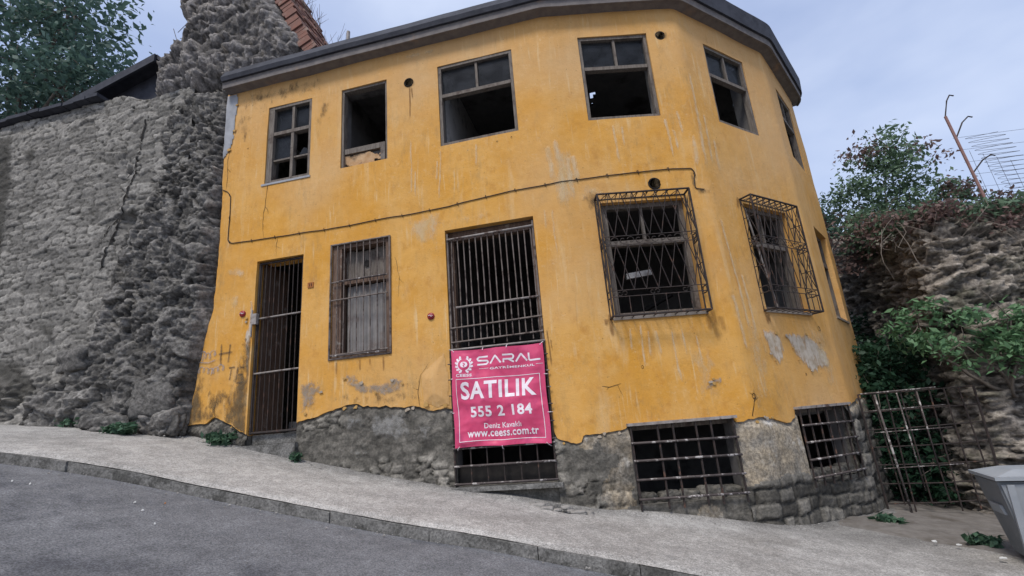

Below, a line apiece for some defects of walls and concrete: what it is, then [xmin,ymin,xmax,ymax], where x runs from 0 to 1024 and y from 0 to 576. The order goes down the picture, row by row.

crack [99,119,146,271]
peeling [763,329,829,372]
flaking render [296,376,456,488]